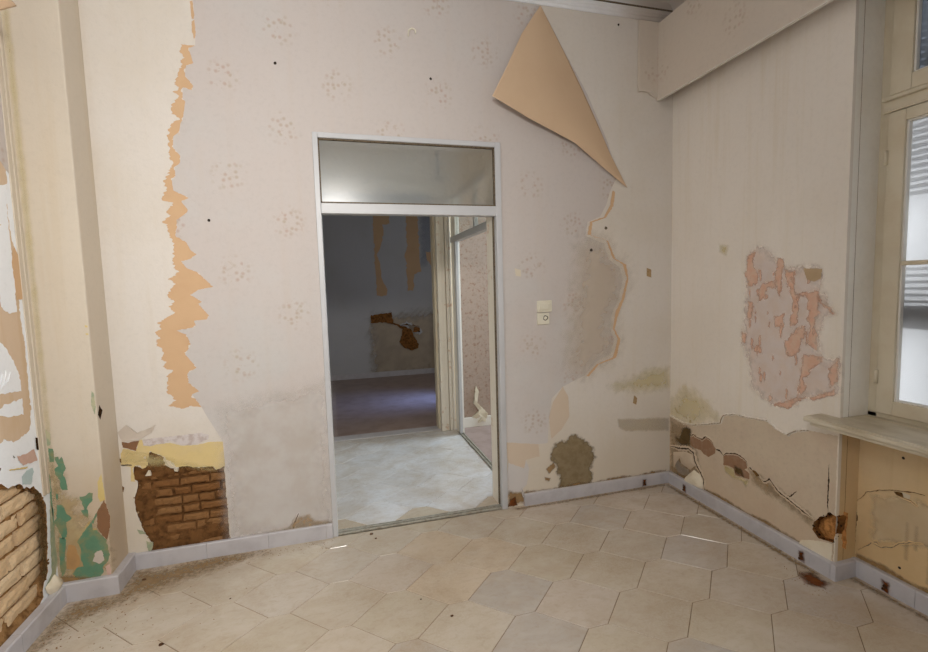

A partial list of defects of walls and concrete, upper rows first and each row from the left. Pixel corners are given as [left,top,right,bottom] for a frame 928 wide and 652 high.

peeling [492,5,627,187]
flaking render [0,343,24,417]
flaking render [370,312,422,350]
peeling [742,248,839,409]
flaking render [0,429,111,647]
flaking render [120,433,231,551]
crack [669,445,724,490]
flaking render [669,413,848,561]
crack [749,463,833,520]
crack [857,488,928,507]